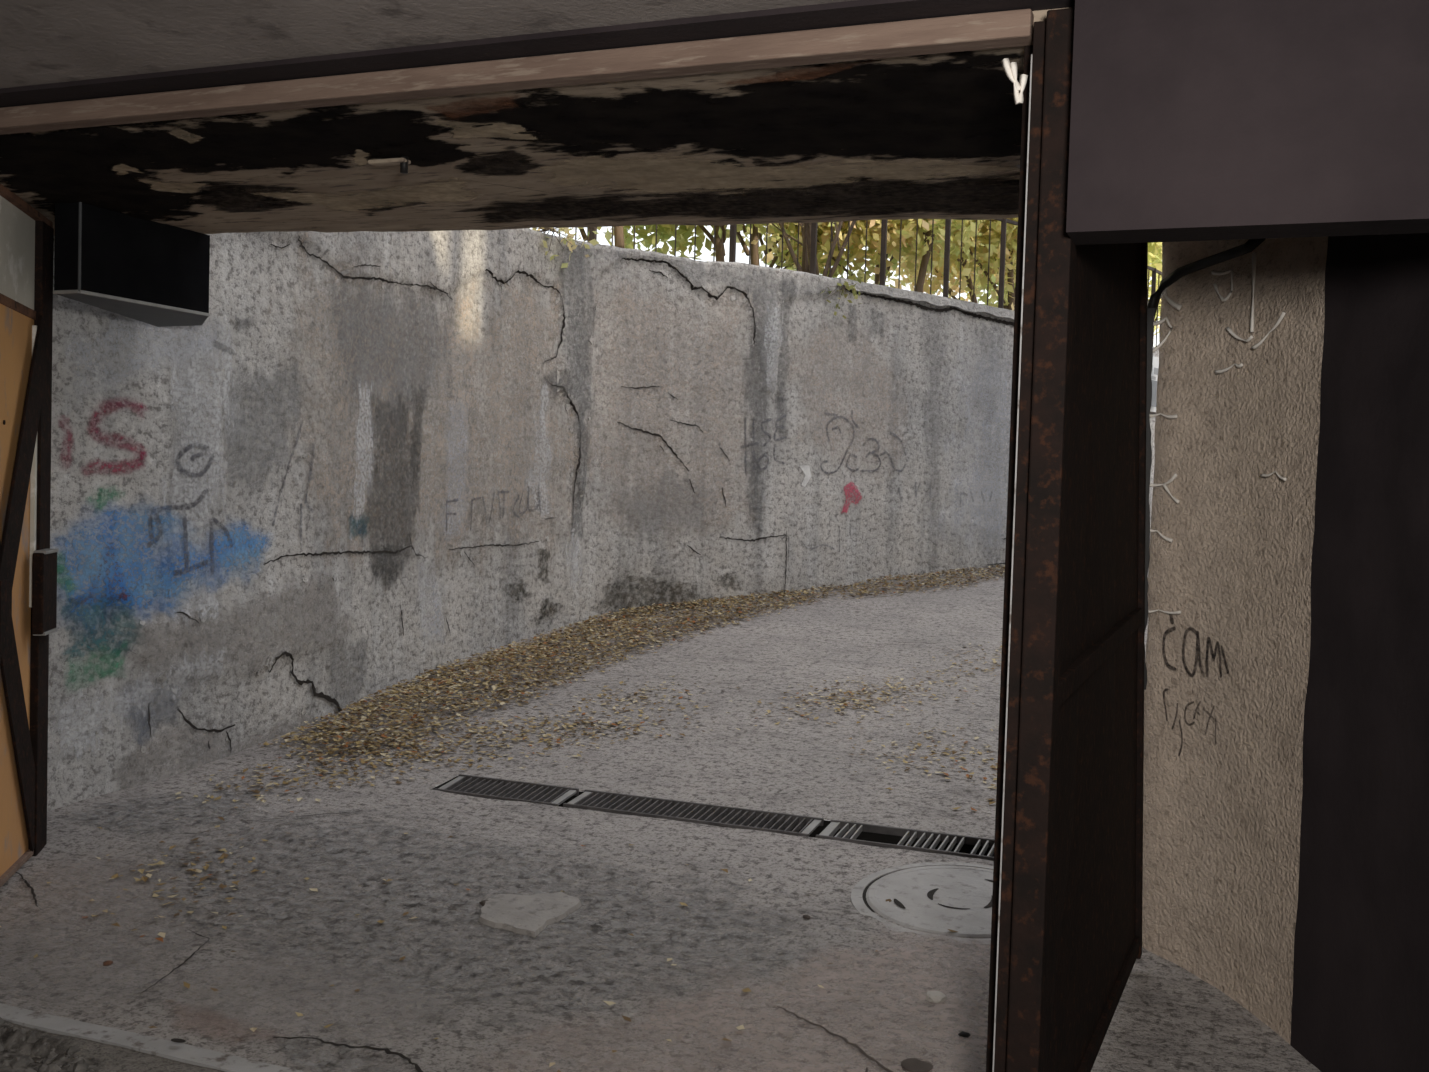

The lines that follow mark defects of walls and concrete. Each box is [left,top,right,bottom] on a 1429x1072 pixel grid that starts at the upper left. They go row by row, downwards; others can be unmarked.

peeling [170,129,203,142]
peeling [437,120,536,140]
peeling [112,164,205,193]
peeling [254,177,477,211]
peeling [537,155,1015,195]
crack [270,236,453,300]
crack [622,258,756,343]
water stain [350,290,433,584]
crack [263,269,581,566]
crack [618,386,787,597]
crack [269,651,342,711]
spalling [0,1020,102,1072]